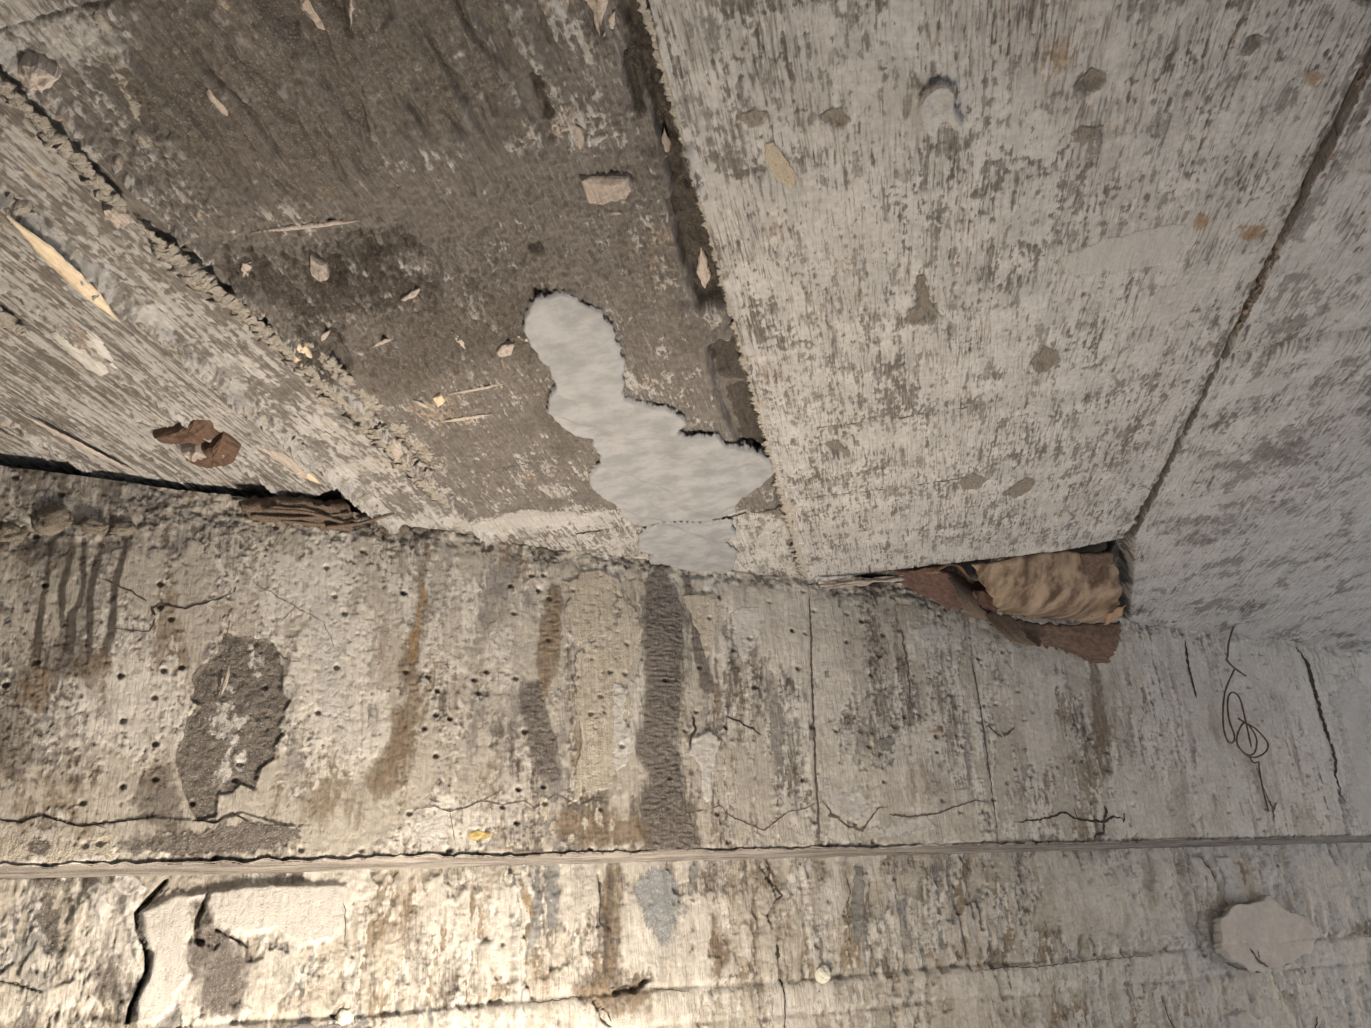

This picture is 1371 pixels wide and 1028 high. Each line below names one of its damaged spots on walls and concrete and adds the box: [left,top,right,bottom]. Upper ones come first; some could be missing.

water stain [29,538,130,673]
crack [0,814,149,828]
flaking render [120,633,299,859]
water stain [520,564,761,948]
peeling [95,882,347,1028]